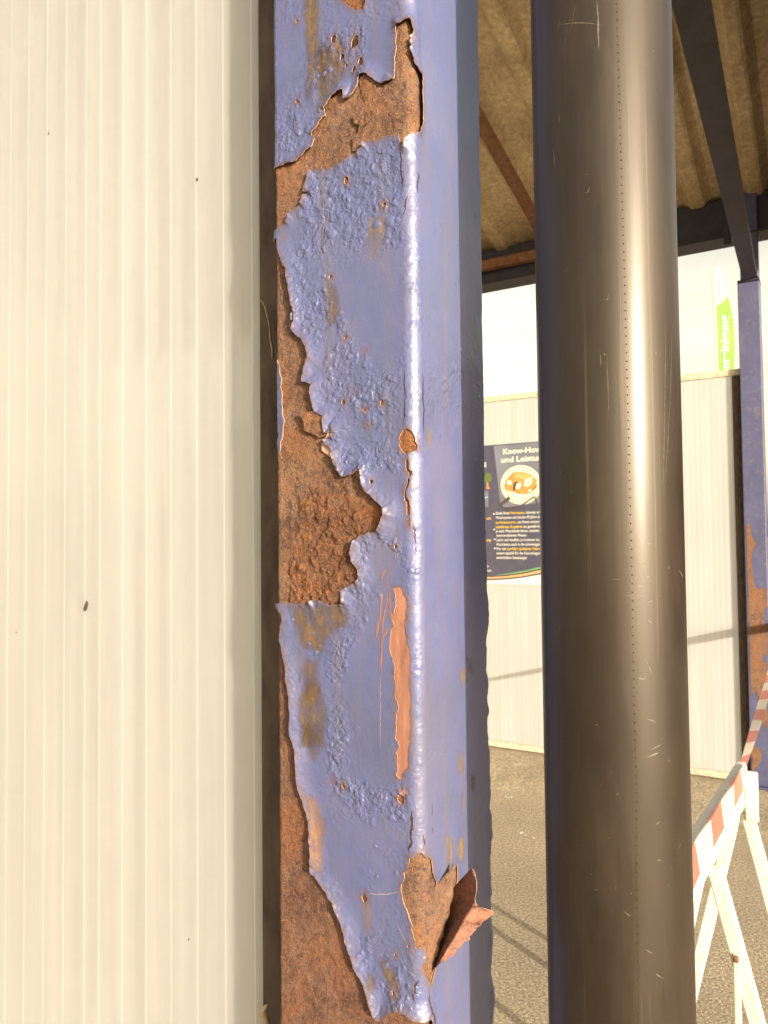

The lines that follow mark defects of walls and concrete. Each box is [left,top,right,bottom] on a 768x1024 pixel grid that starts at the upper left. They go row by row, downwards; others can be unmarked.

peeling [276,18,420,228]
peeling [260,243,382,631]
peeling [400,429,417,526]
corrosion [294,607,346,750]
peeling [257,644,430,1024]
peeling [401,853,494,983]